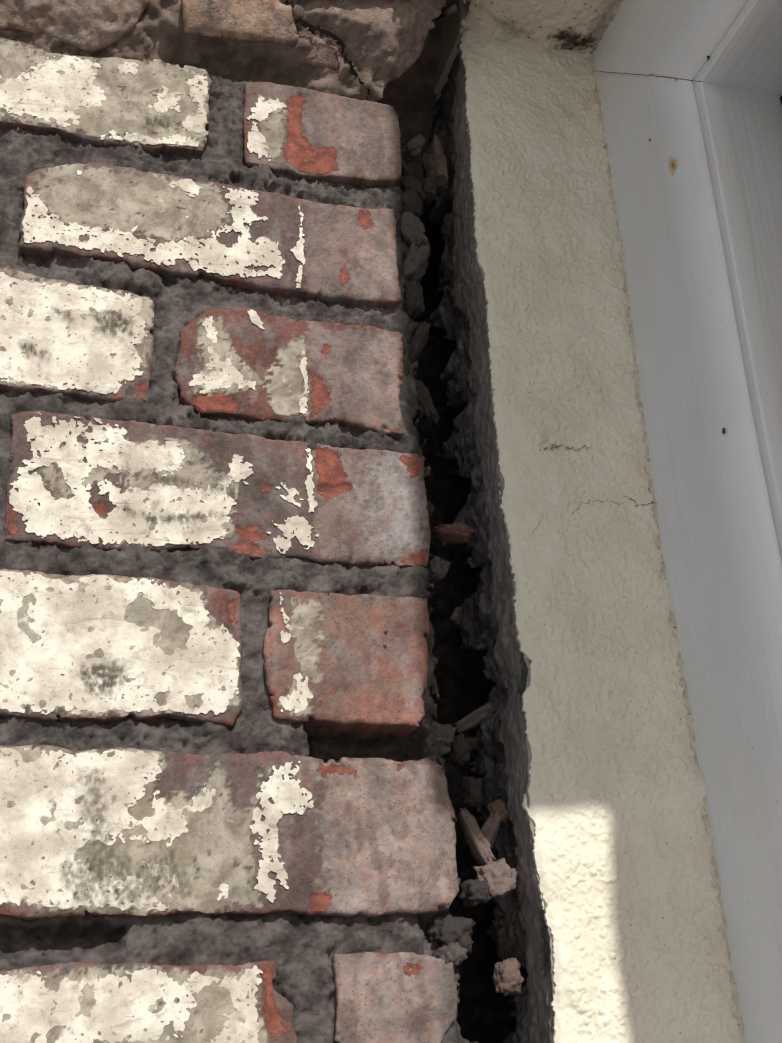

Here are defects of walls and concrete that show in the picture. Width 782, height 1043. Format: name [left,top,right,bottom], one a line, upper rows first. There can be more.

peeling [0,35,210,148]
crack [285,0,372,95]
damp [548,28,593,50]
peeling [22,163,306,288]
peeling [0,268,154,399]
peeling [189,316,331,420]
peeling [7,412,353,555]
peeling [0,569,242,718]
peeling [277,592,324,717]
crack [397,134,525,1043]
peeling [0,745,316,916]
peeling [0,965,289,1043]